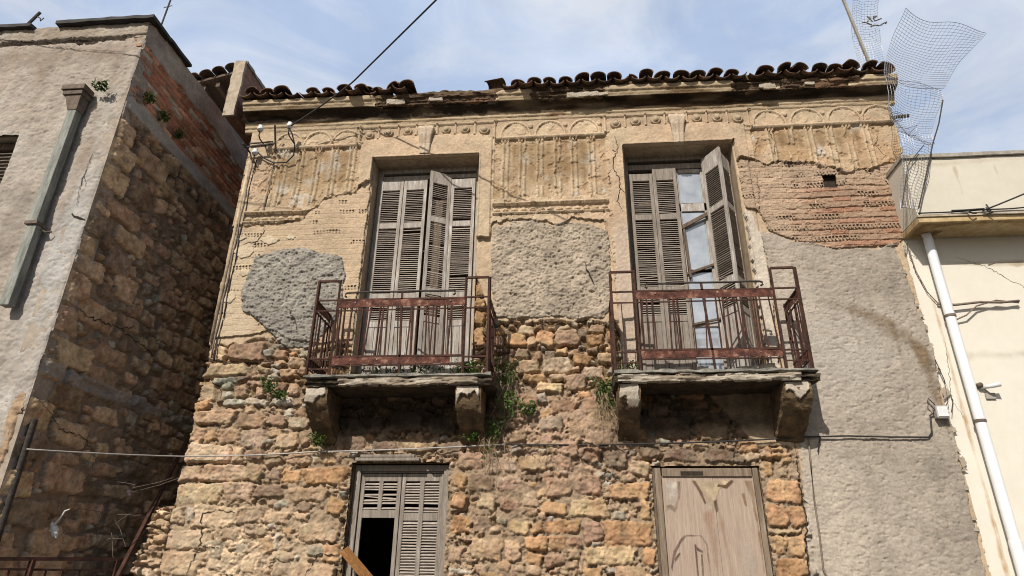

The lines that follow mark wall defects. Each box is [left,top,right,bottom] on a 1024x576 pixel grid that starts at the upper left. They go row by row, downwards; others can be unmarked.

peeling [567,91,608,99]
crack [608,136,623,209]
spalling [737,157,903,249]
spalling [215,178,372,344]
crack [65,299,159,360]
leakage [913,343,929,369]